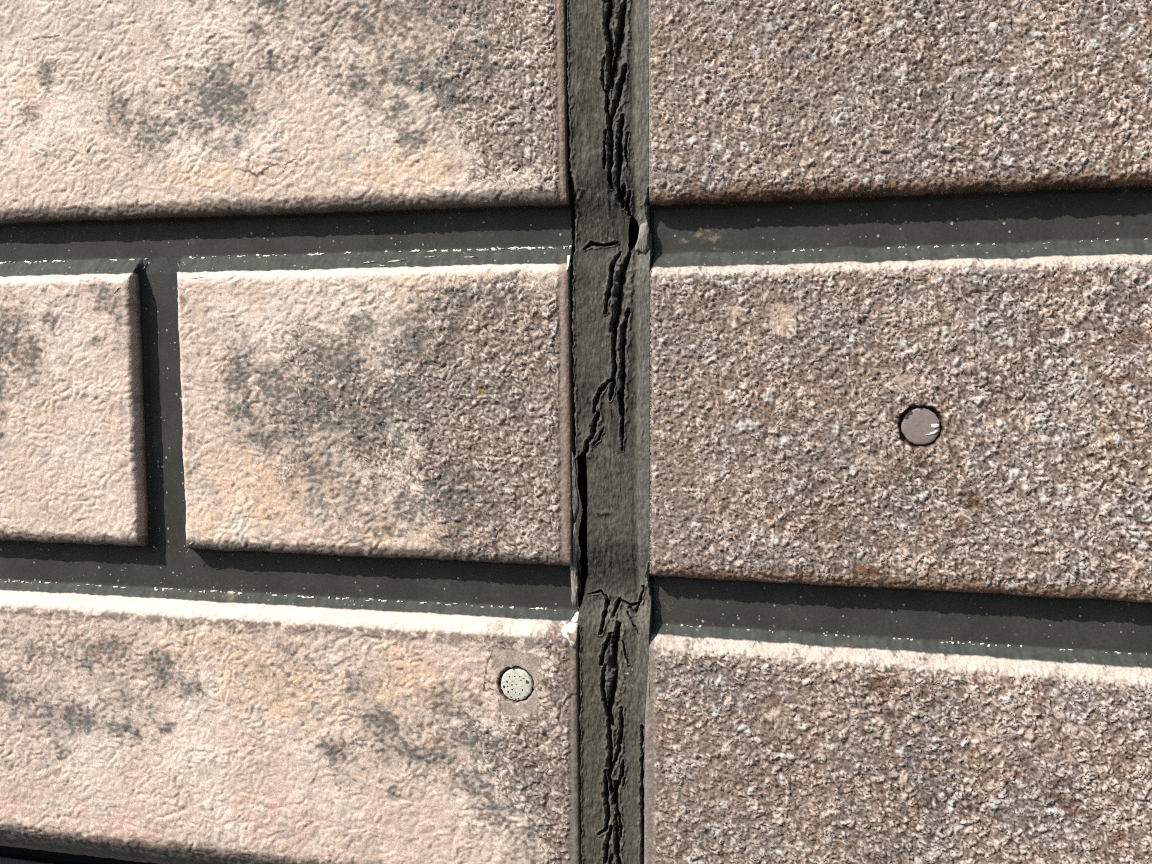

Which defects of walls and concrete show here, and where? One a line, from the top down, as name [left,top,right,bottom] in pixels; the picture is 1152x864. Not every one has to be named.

leakage [107,0,506,155]
crack [603,0,652,231]
crack [566,0,631,454]
leakage [0,309,56,438]
leakage [216,354,402,509]
leakage [304,289,466,388]
leakage [28,704,142,759]
leakage [148,651,204,698]
leakage [317,738,347,761]
leakage [363,681,498,766]
crack [558,564,652,864]
leakage [451,770,540,864]